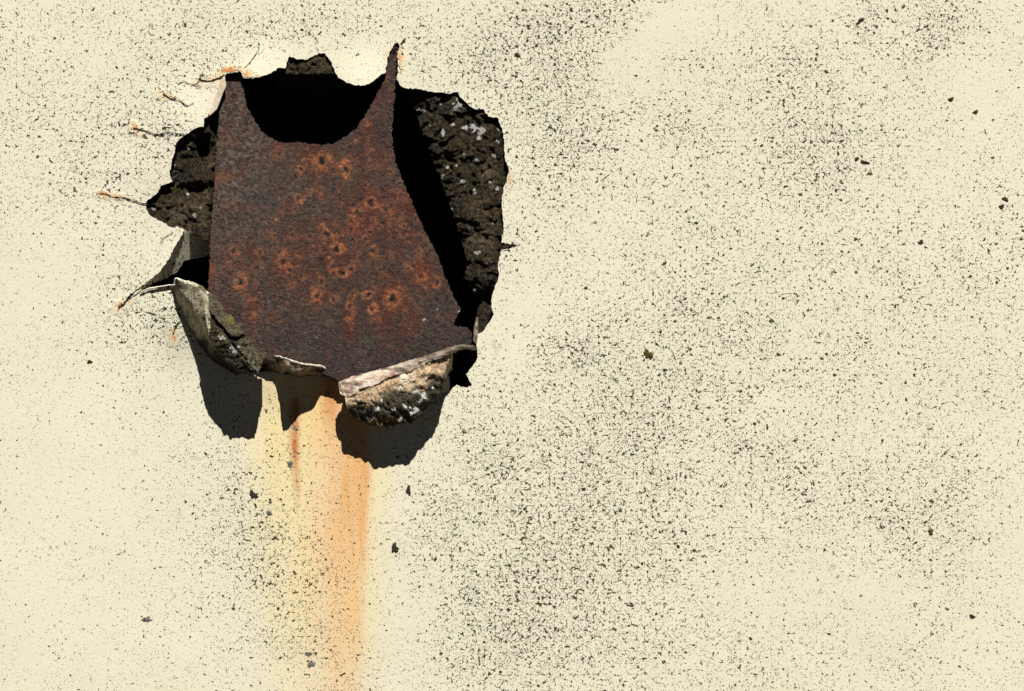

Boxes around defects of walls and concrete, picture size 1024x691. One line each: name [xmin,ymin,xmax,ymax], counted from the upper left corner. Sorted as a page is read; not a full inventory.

crack [163,42,259,106]
corrosion [192,63,263,89]
corrosion [383,44,408,83]
crack [133,128,185,138]
spalling [123,44,516,428]
corrosion [229,373,403,691]